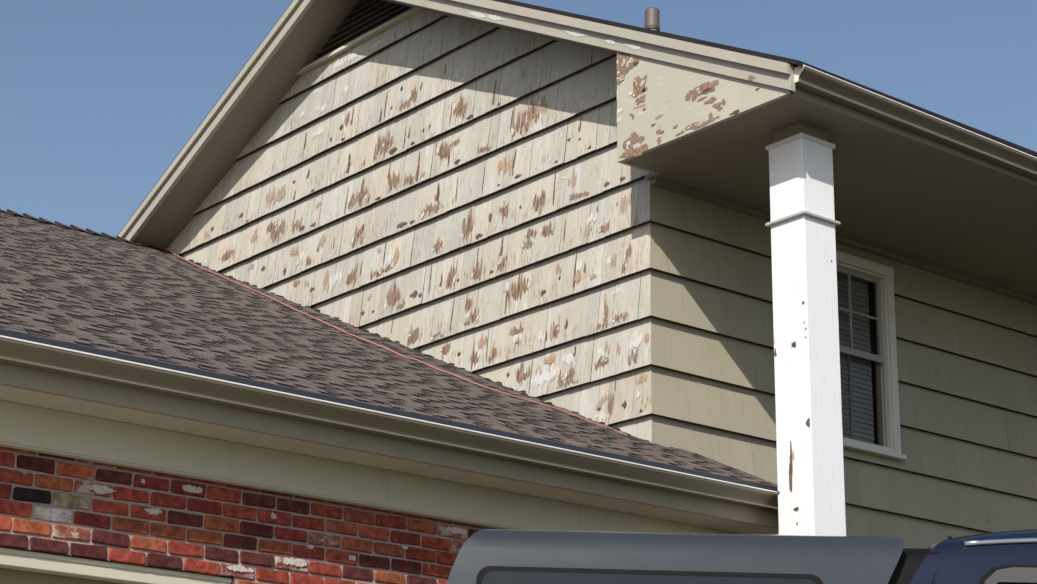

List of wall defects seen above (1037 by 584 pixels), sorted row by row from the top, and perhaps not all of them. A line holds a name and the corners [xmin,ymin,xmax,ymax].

peeling [510,94,547,135]
peeling [617,52,739,158]
peeling [435,136,460,164]
peeling [239,210,329,292]
peeling [344,171,415,213]
peeling [360,247,406,315]
peeling [461,208,482,240]
peeling [431,239,546,309]
peeling [497,190,555,253]
peeling [407,293,498,369]
peeling [507,352,578,388]
peeling [593,302,649,384]